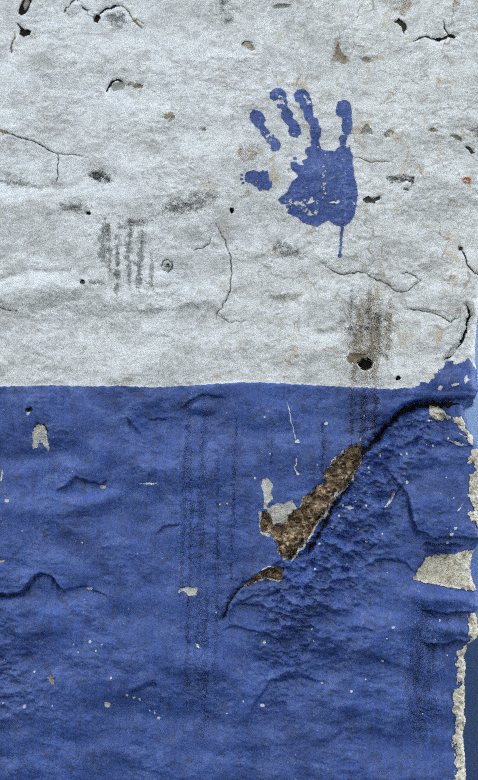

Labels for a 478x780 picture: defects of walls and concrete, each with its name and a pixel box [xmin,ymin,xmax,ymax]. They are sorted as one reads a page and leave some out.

flaking render [10,0,36,53]
crack [0,130,83,181]
damp [98,218,154,289]
crack [195,225,246,323]
crack [322,263,458,323]
crack [458,247,478,275]
peeling [32,424,49,451]
spalling [429,406,478,527]
spalling [245,439,364,587]
crack [0,574,66,597]
spalling [413,549,476,591]
spalling [450,612,478,780]